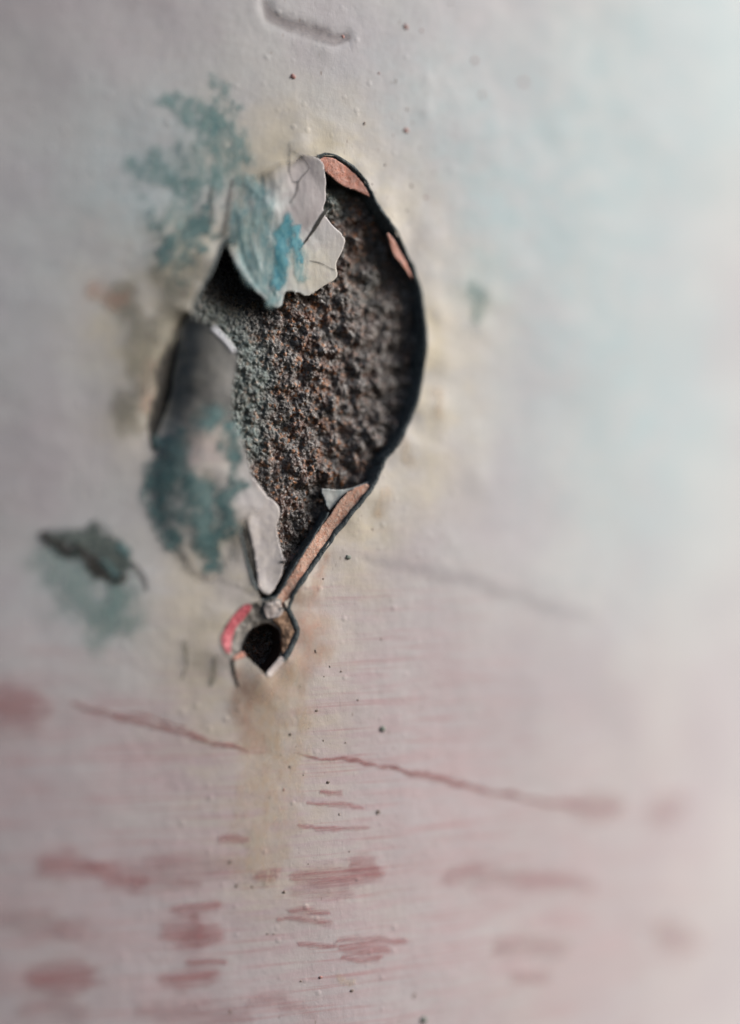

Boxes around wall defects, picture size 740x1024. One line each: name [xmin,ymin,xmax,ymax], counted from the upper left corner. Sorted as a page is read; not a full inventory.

damp [118,88,306,385]
damp [142,405,249,571]
peeling [189,152,428,677]